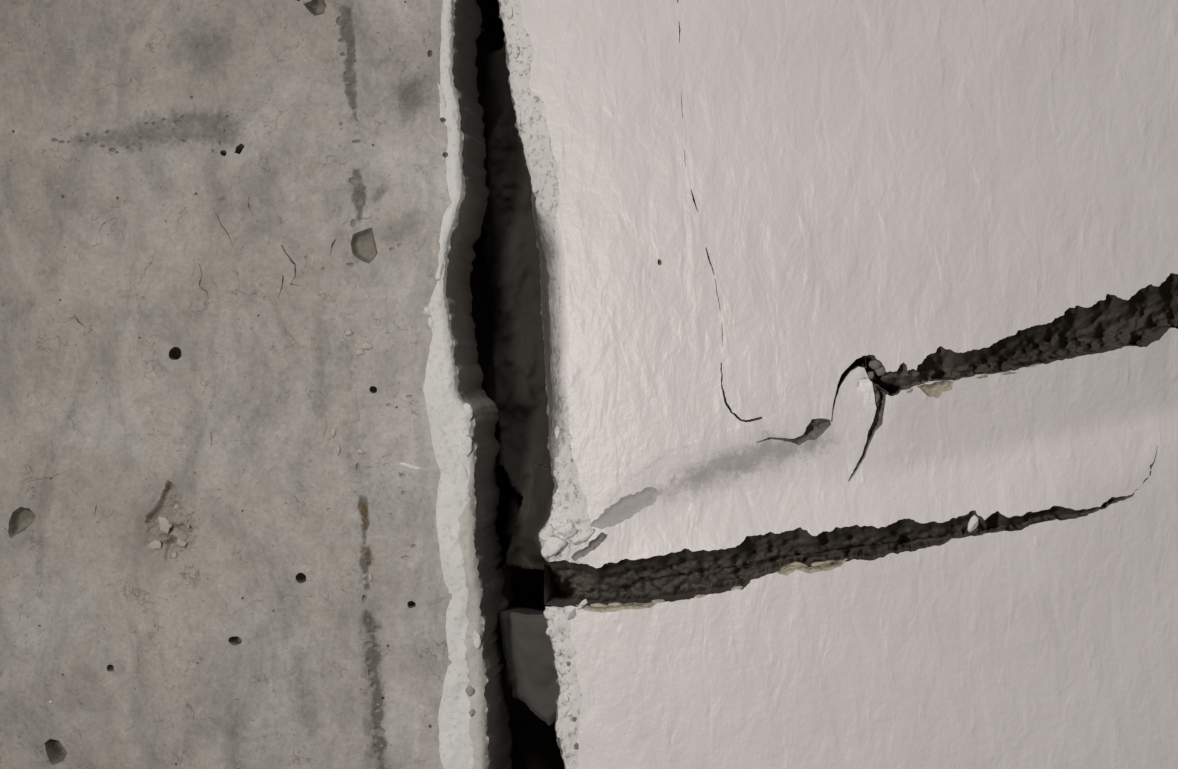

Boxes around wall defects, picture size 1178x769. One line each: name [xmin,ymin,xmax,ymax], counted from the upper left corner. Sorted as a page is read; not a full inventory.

spalling [143,479,200,563]
crack [470,0,1178,769]